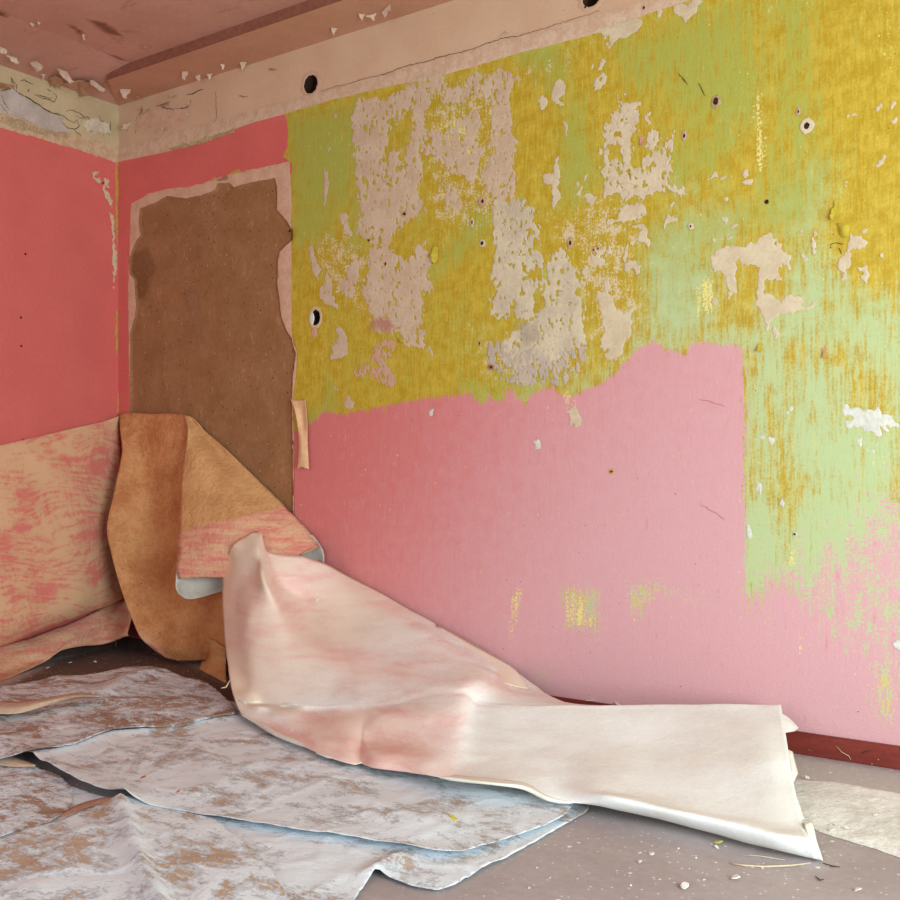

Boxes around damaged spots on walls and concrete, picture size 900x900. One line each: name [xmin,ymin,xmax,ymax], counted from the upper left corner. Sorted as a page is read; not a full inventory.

spalling [578,0,602,13]
peeling [592,5,646,49]
peeling [657,0,702,23]
peeling [30,61,106,97]
spalling [300,71,321,96]
peeling [591,58,607,91]
peeling [0,82,69,138]
peeling [92,163,119,289]
peeling [308,66,687,392]
peeling [710,216,818,339]
spalling [115,149,297,514]
peeling [842,403,900,454]